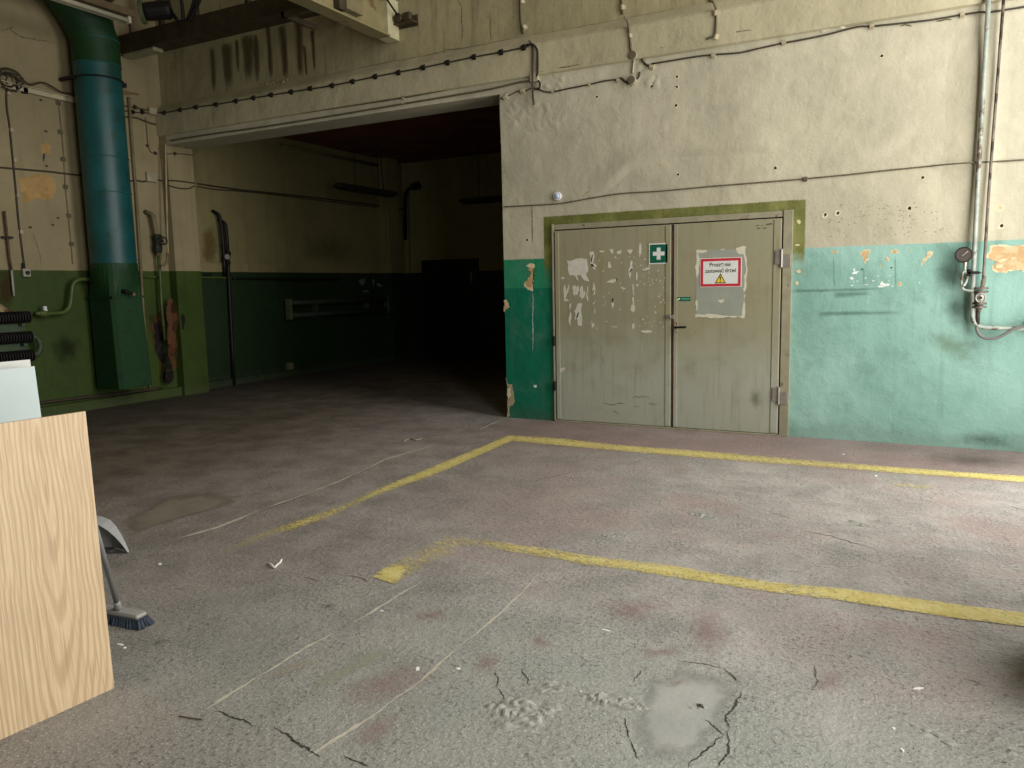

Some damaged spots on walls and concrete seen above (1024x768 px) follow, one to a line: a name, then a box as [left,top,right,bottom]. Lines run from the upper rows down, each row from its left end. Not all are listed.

damp [211,24,315,84]
peeling [19,173,56,203]
peeling [524,263,535,291]
spalling [797,202,944,288]
peeling [986,244,1024,273]
corrosion [150,298,178,384]
spalling [506,380,515,417]
crack [388,572,540,704]
crack [219,711,368,766]
crack [684,661,742,767]